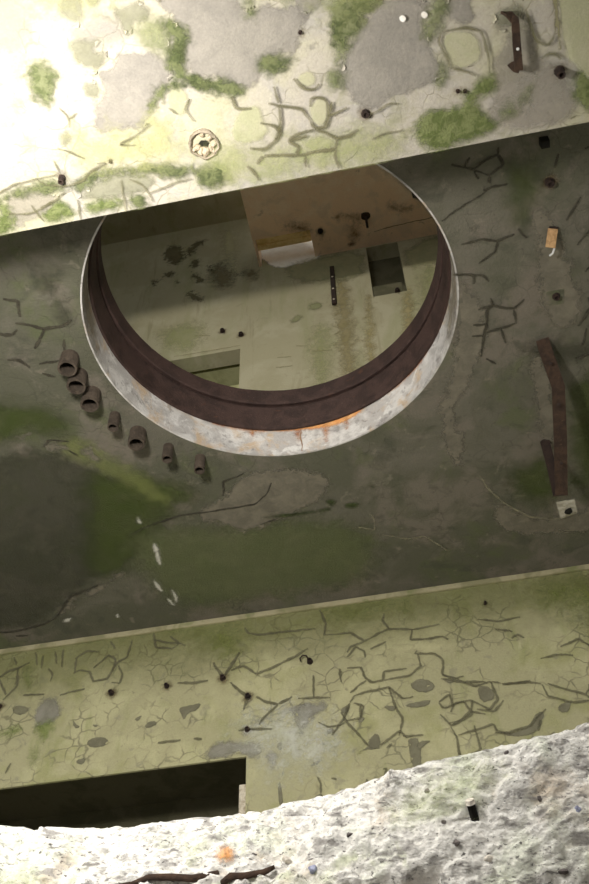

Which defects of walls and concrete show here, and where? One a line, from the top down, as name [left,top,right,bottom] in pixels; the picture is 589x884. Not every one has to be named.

peeling [59,0,98,29]
peeling [71,0,321,132]
peeling [338,0,440,109]
peeling [445,0,480,67]
crack [231,79,398,180]
crack [0,149,106,221]
crack [0,298,72,377]
crack [453,228,527,364]
corrosion [281,410,361,434]
leakage [0,453,372,627]
crack [0,584,132,700]
crack [178,610,589,775]